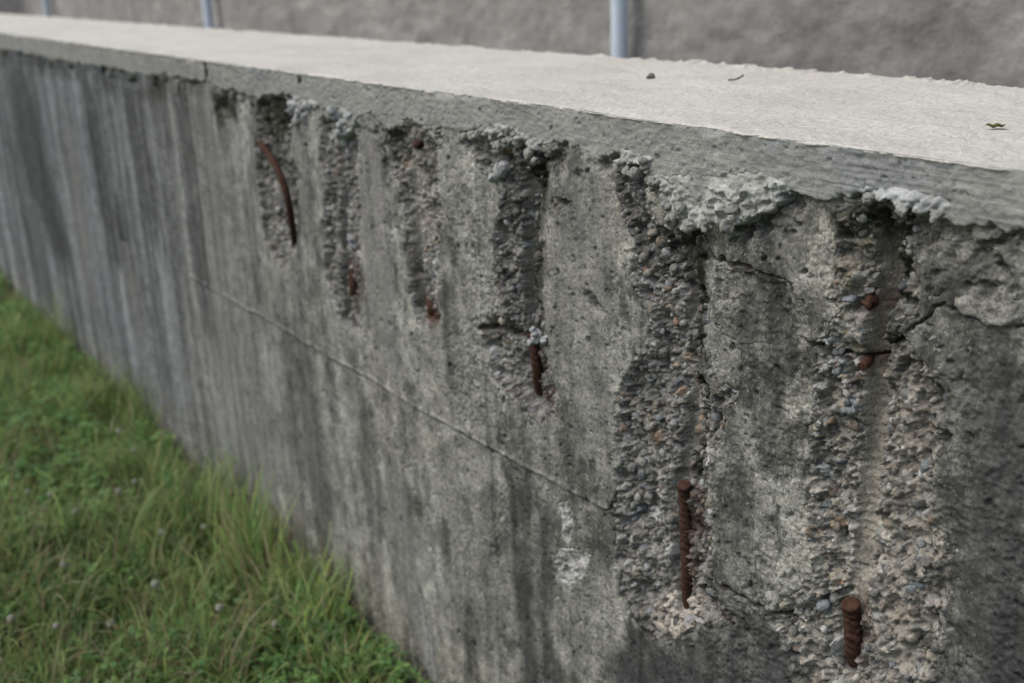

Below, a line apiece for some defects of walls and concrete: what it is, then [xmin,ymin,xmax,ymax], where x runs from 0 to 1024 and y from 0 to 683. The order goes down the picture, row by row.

spalling [255,96,301,270]
spalling [320,116,364,333]
spalling [385,122,443,323]
crack [425,414,506,458]
crack [479,322,530,337]
spalling [473,141,576,429]
spalling [611,171,795,642]
crack [718,255,793,288]
spalling [764,201,1024,683]
crack [805,301,990,356]